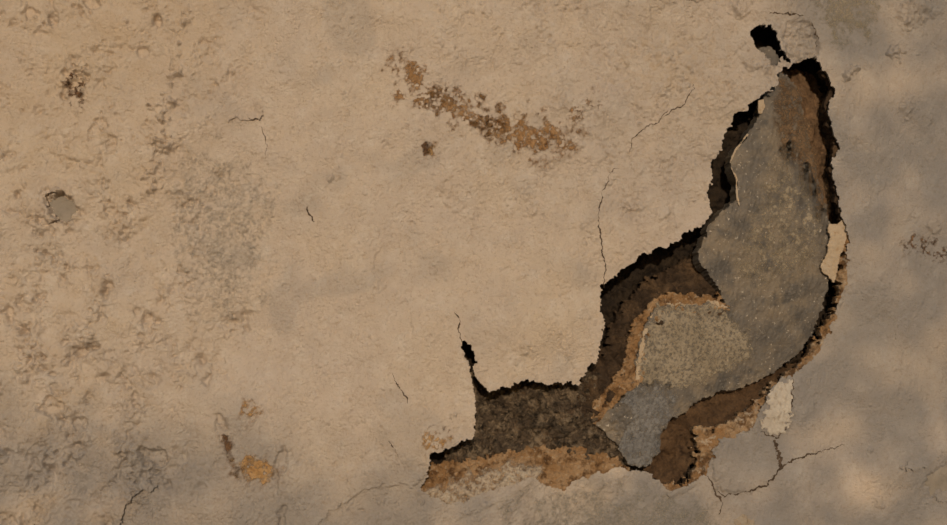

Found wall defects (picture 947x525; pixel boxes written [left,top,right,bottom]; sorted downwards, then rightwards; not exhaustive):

corrosion [382,56,592,162]
spalling [421,25,850,505]
corrosion [235,455,272,484]
crack [707,380,843,514]